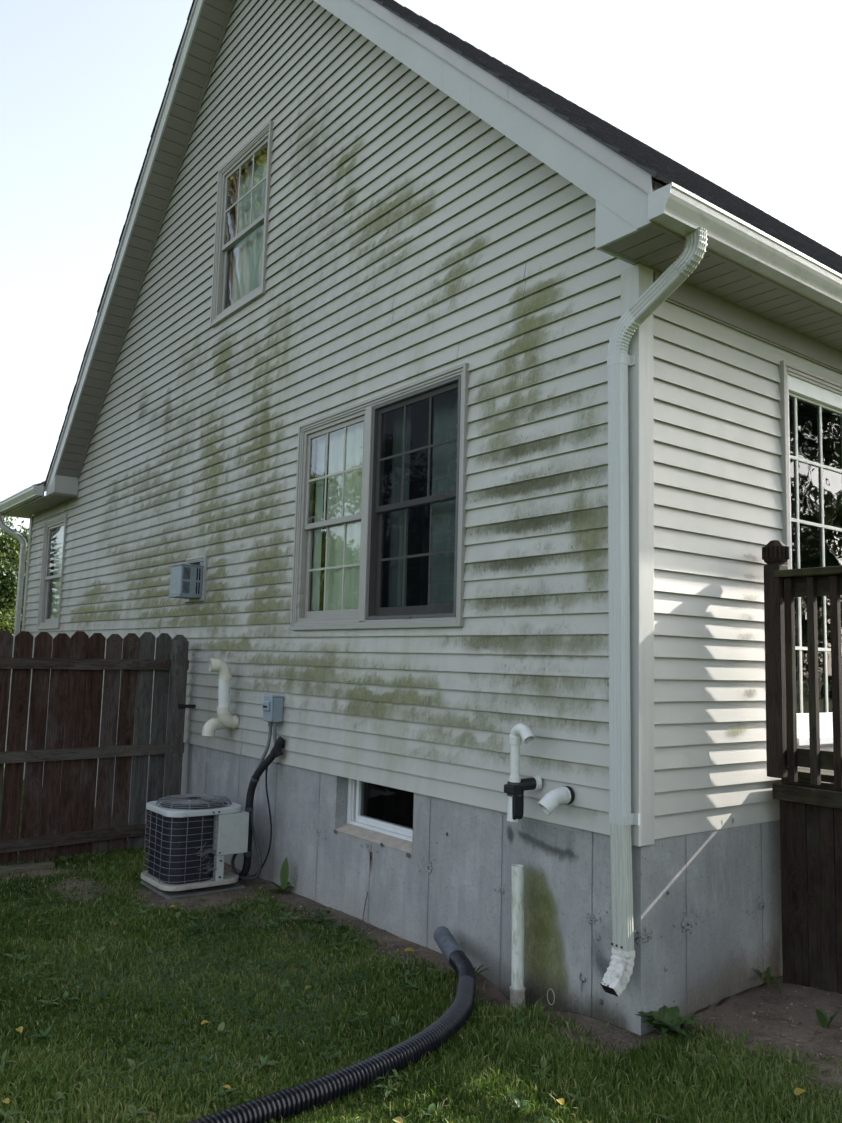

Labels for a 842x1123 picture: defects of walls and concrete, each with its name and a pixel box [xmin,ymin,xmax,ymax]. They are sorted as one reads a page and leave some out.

leakage [479,280,560,458]
leakage [485,473,569,494]
leakage [123,336,335,692]
leakage [478,504,603,583]
leakage [478,596,533,605]
leakage [471,635,593,656]
leakage [335,678,440,718]